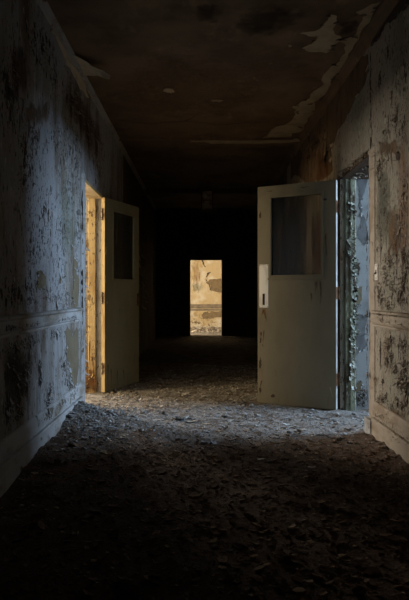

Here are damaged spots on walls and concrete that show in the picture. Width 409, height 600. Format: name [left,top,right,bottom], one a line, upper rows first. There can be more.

peeling [189,2,380,144]
peeling [2,314,96,423]
peeling [0,115,105,315]
spalling [190,311,221,327]
spalling [205,273,221,294]
peeling [333,41,409,443]